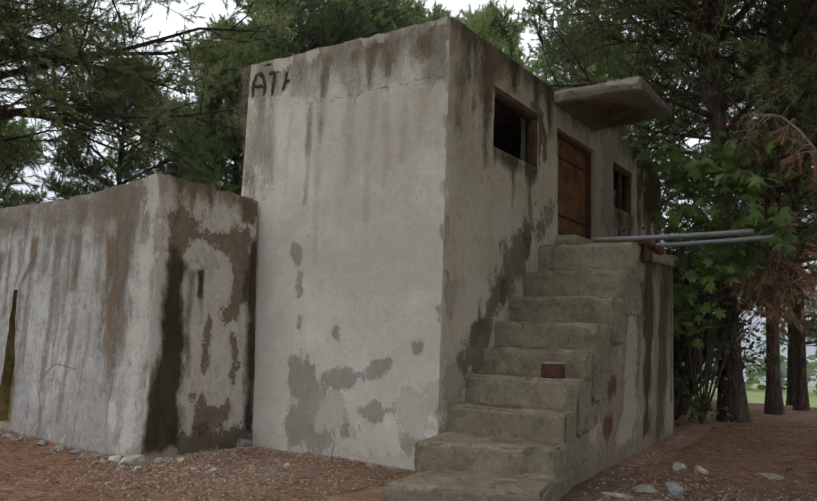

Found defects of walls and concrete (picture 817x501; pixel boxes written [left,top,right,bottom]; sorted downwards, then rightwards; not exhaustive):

leakage [23,237,38,280]
leakage [102,186,138,392]
peeling [106,173,258,456]
peeling [290,389,415,471]
leakage [615,147,662,243]
leakage [635,252,673,440]